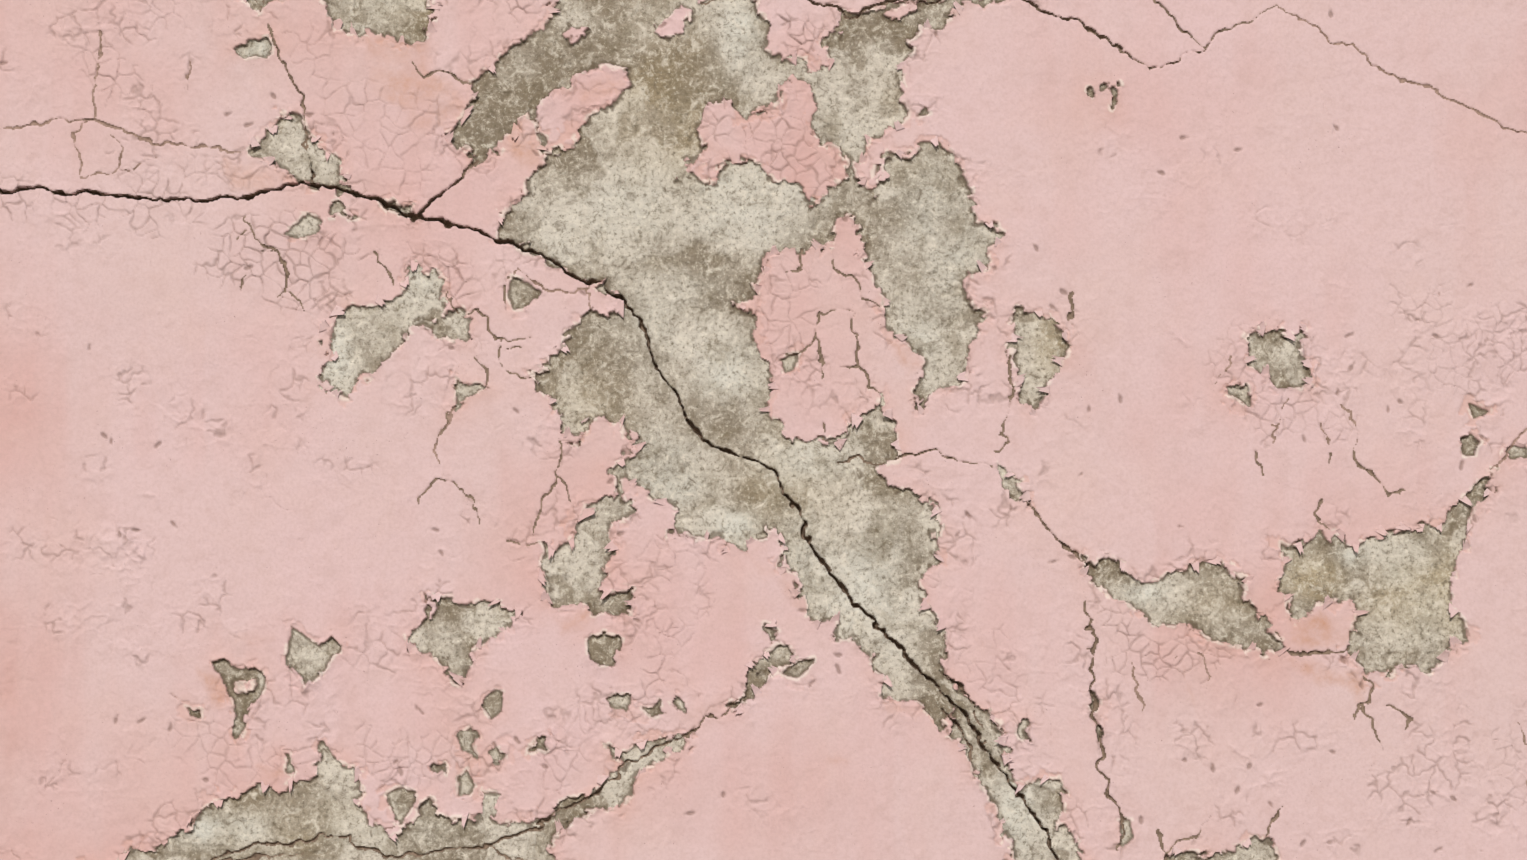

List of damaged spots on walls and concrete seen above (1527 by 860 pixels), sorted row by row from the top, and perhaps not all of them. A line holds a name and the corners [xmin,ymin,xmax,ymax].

crack [1022,0,1527,134]
peeling [247,109,361,241]
peeling [316,260,475,401]
crack [0,0,1066,860]
peeling [441,0,1087,860]
crack [1199,277,1527,529]
peeling [1079,398,1527,678]
peeling [403,590,523,690]
crack [1026,502,1242,851]
crack [1275,632,1413,743]
peeling [117,688,695,860]
crack [1156,829,1201,860]